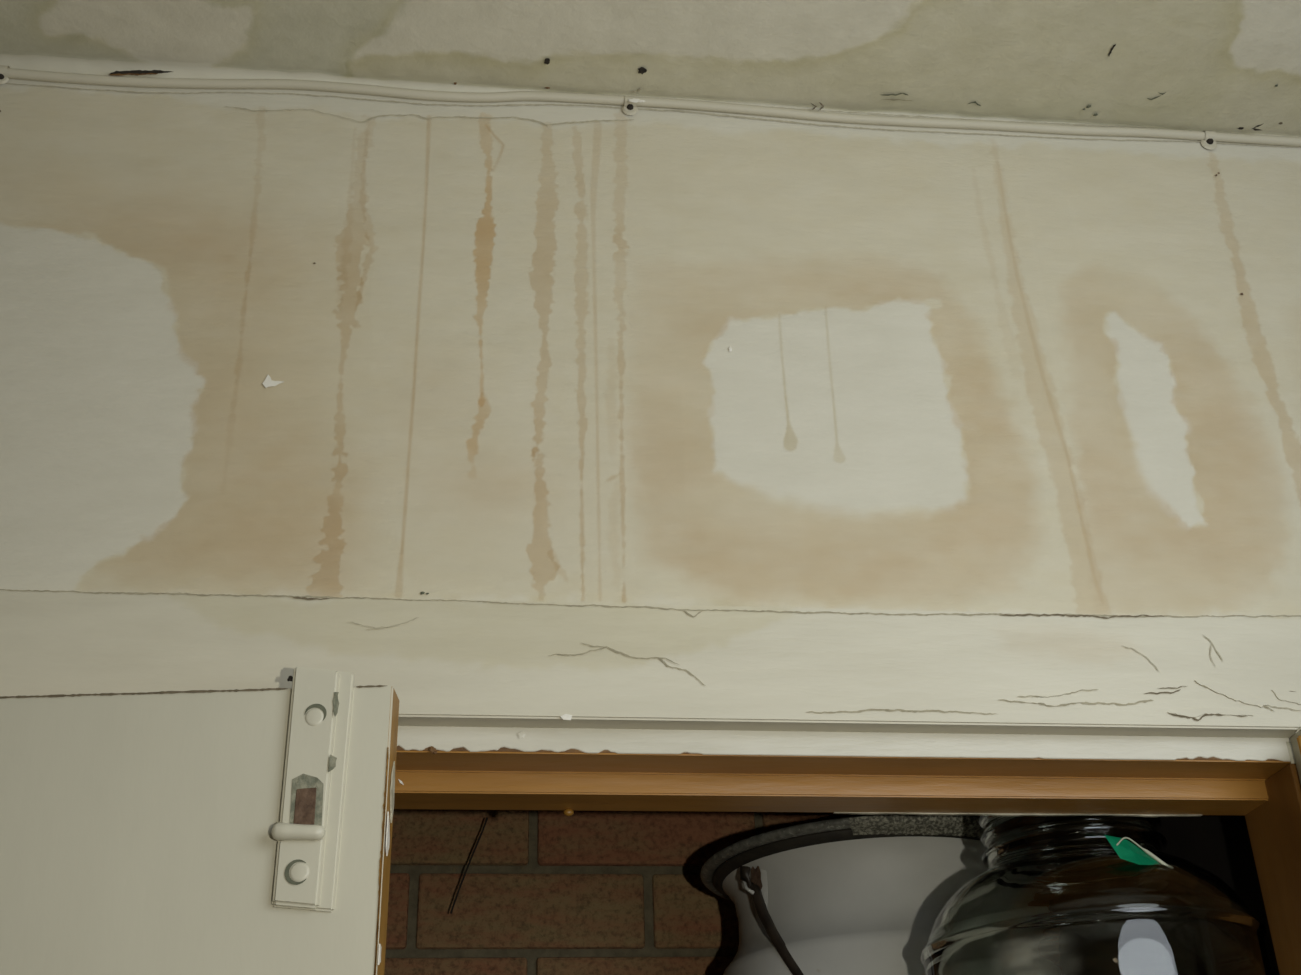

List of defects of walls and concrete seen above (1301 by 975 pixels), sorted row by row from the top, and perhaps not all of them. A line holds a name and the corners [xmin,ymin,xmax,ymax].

crack [0,589,1301,721]